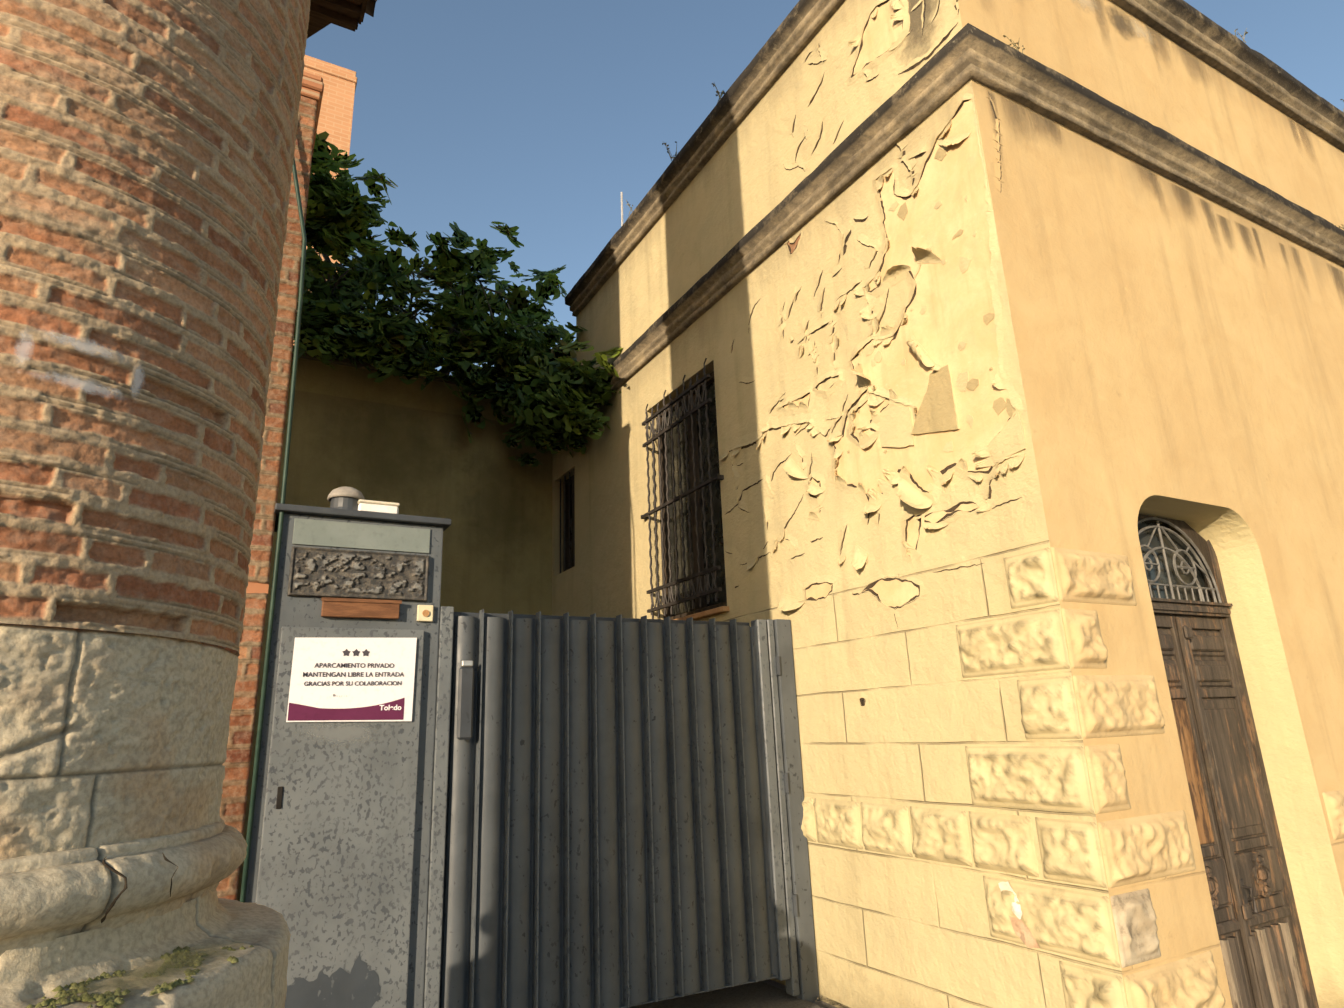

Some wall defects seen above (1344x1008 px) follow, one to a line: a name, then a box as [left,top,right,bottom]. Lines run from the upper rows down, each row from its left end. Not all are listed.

peeling [847,0,910,86]
water stain [1203,201,1258,241]
peeling [720,93,1026,614]
crack [101,856,127,923]
crack [163,854,178,897]